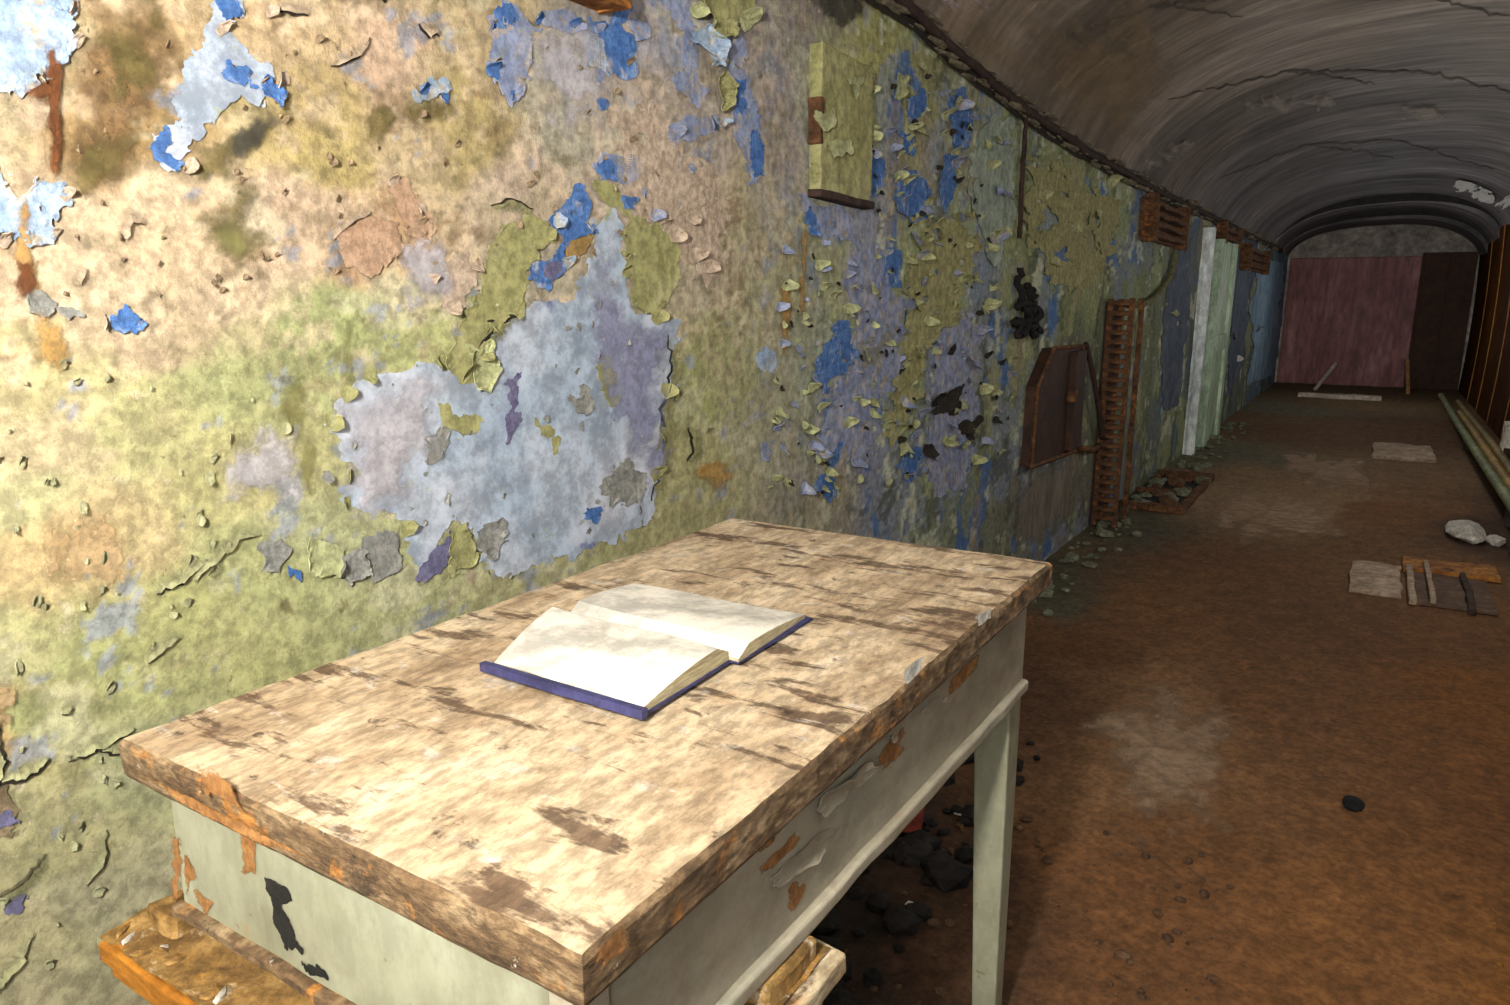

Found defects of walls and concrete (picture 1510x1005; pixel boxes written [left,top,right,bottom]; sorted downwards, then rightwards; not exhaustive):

peeling [0,0,98,98]
peeling [149,0,297,174]
crack [865,0,1510,253]
peeling [257,0,765,586]
peeling [756,47,1199,503]
peeling [1228,261,1284,390]
peeling [32,595,47,611]
peeling [39,501,124,611]
peeling [193,508,232,554]
peeling [0,659,23,724]